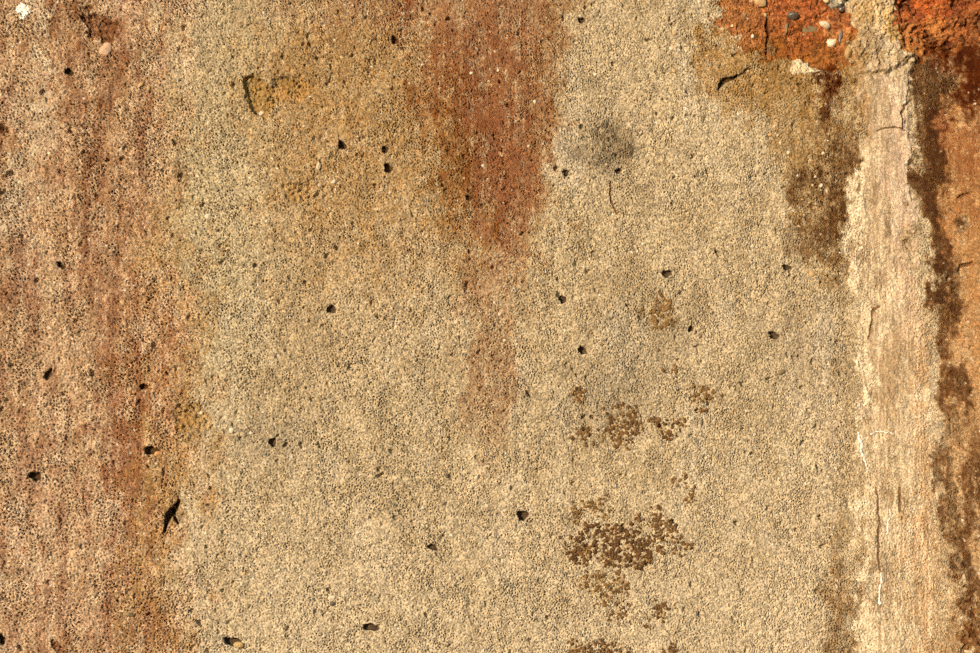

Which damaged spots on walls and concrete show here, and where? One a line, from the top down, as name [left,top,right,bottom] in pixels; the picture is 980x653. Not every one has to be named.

spalling [710,0,858,75]
spalling [892,0,980,65]
corrosion [924,41,980,117]
water stain [833,0,971,653]
crack [858,431,902,605]